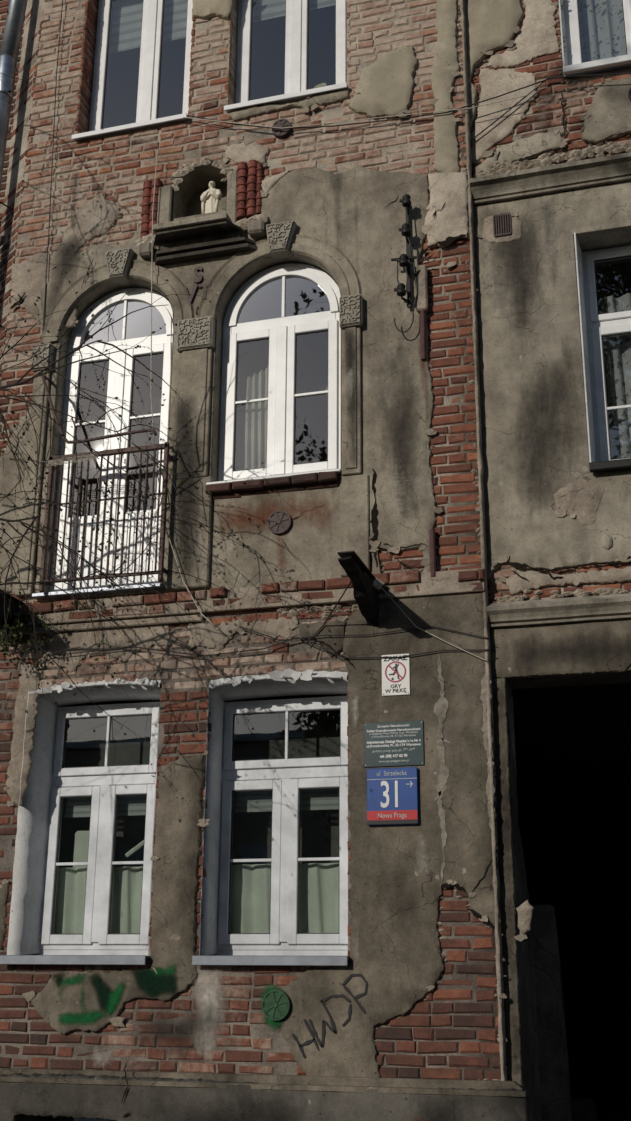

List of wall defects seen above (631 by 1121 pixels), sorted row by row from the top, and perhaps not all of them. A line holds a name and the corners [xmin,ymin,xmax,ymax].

peeling [227,46,418,122]
peeling [430,0,631,178]
crack [369,469,429,567]
spalling [369,258,631,603]
spalling [374,879,534,1081]